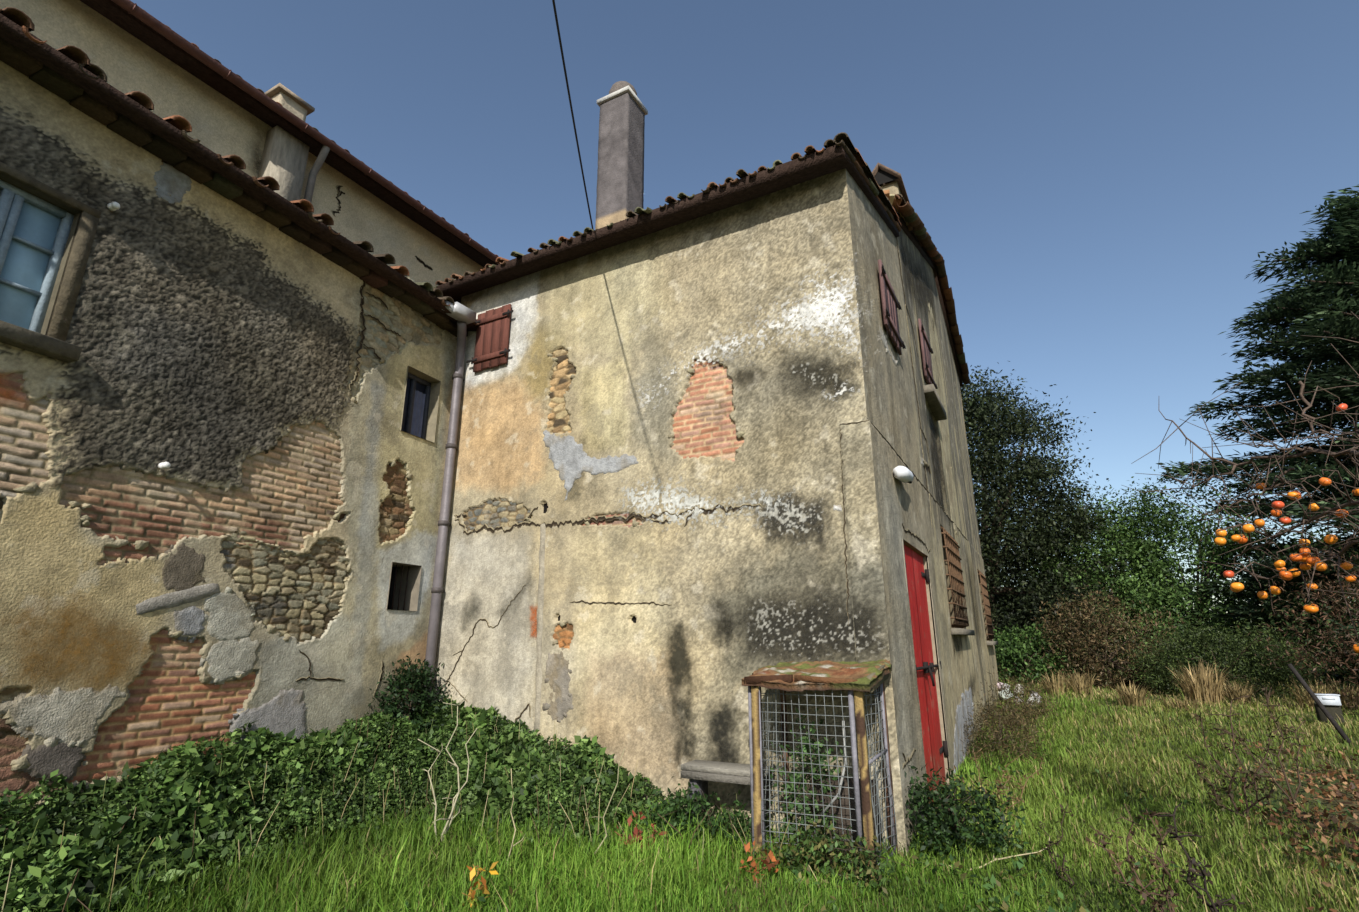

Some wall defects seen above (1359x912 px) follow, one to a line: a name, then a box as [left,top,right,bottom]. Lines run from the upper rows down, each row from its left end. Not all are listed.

crack [348,281,401,391]
spalling [545,347,576,434]
spalling [668,358,745,462]
leakage [643,274,860,402]
spalling [0,371,351,643]
spalling [378,460,414,543]
spalling [0,628,256,815]
crack [438,585,525,702]
flaking render [542,621,574,723]
leakage [669,624,692,757]
leakage [711,705,734,763]
leakage [716,595,881,662]